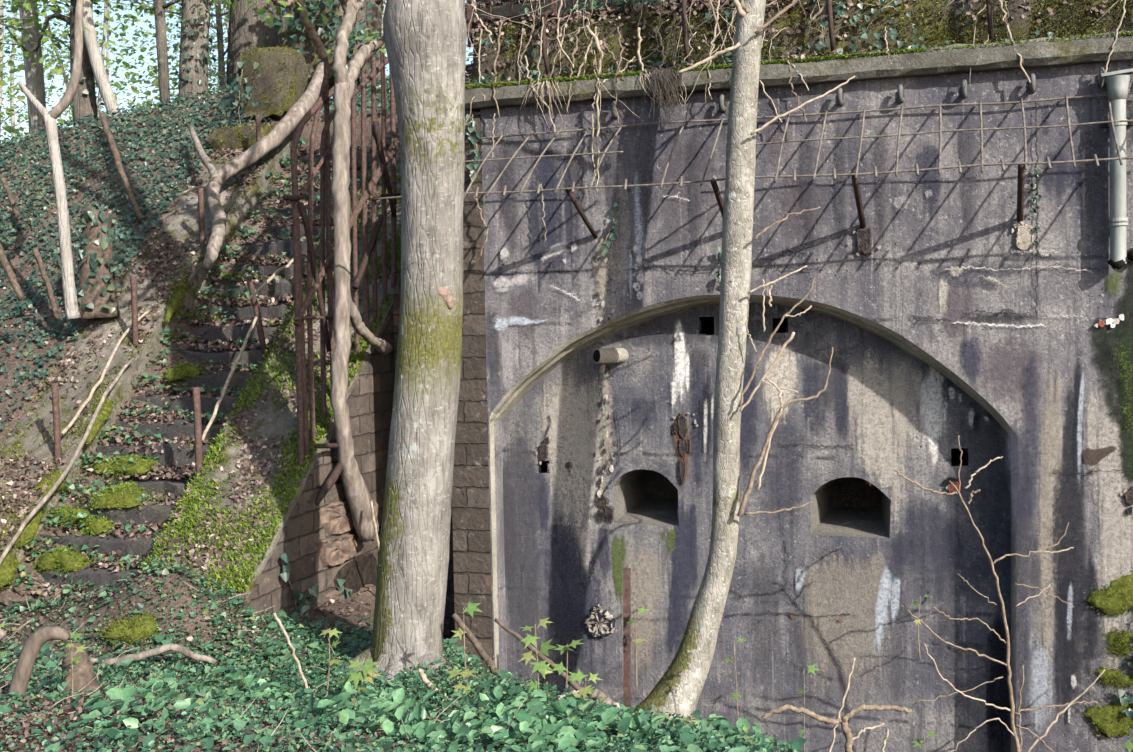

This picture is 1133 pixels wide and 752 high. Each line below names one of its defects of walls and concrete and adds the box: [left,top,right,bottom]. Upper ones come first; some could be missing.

leakage [486,134,582,383]
leakage [629,126,653,300]
leakage [503,373,698,671]
leakage [618,308,720,484]
leakage [740,263,1131,752]